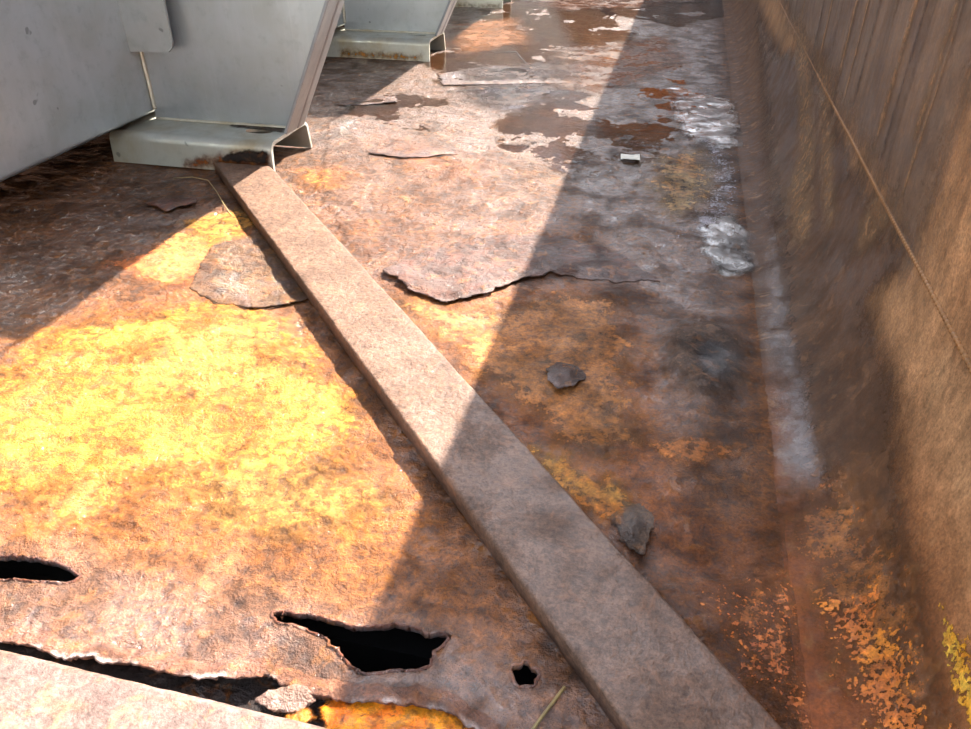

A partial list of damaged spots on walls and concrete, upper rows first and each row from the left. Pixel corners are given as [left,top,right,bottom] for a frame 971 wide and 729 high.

leakage [448,18,525,52]
leakage [462,36,682,112]
leakage [522,0,711,10]
leakage [647,88,755,276]
corrosion [102,211,254,285]
corrosion [0,303,382,534]
corrosion [401,291,736,465]
leakage [757,0,971,729]
corrosion [532,449,654,555]
corrosion [700,471,971,729]
peeling [0,625,506,729]
corrosion [322,698,472,729]